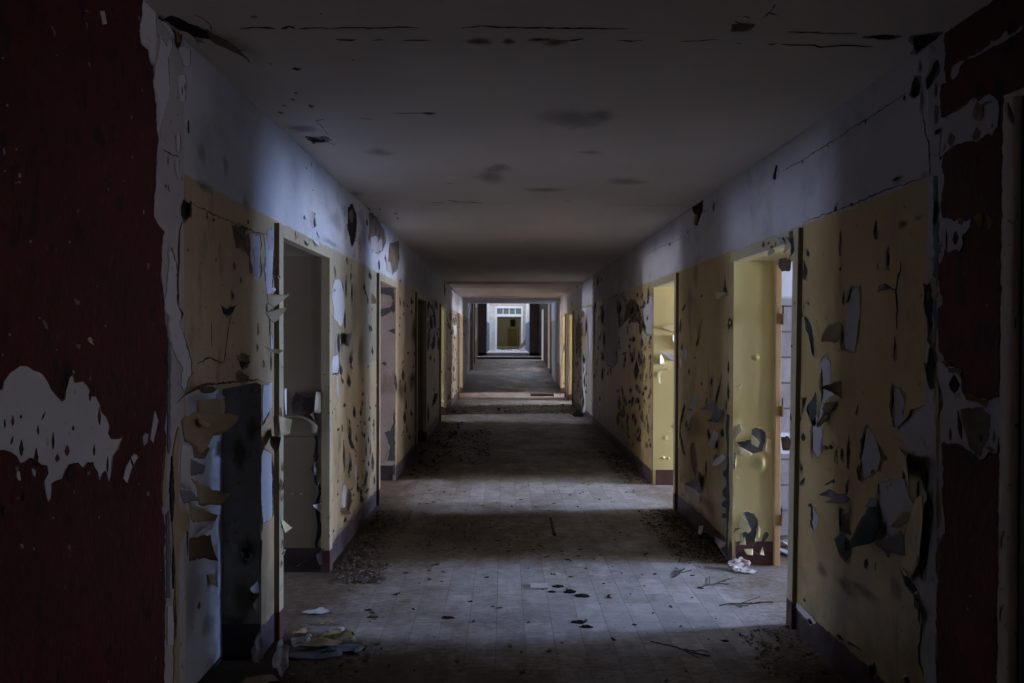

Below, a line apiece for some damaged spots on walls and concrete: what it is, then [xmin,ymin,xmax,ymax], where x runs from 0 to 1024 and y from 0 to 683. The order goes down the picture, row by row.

peeling [139,0,253,142]
crack [241,26,430,42]
crack [462,26,641,42]
crack [768,31,902,48]
crack [781,92,908,172]
crack [802,118,930,222]
peeling [908,25,1023,160]
crack [197,315,232,364]
peeling [555,285,702,450]
peeling [0,200,477,683]
peeling [679,176,1001,683]